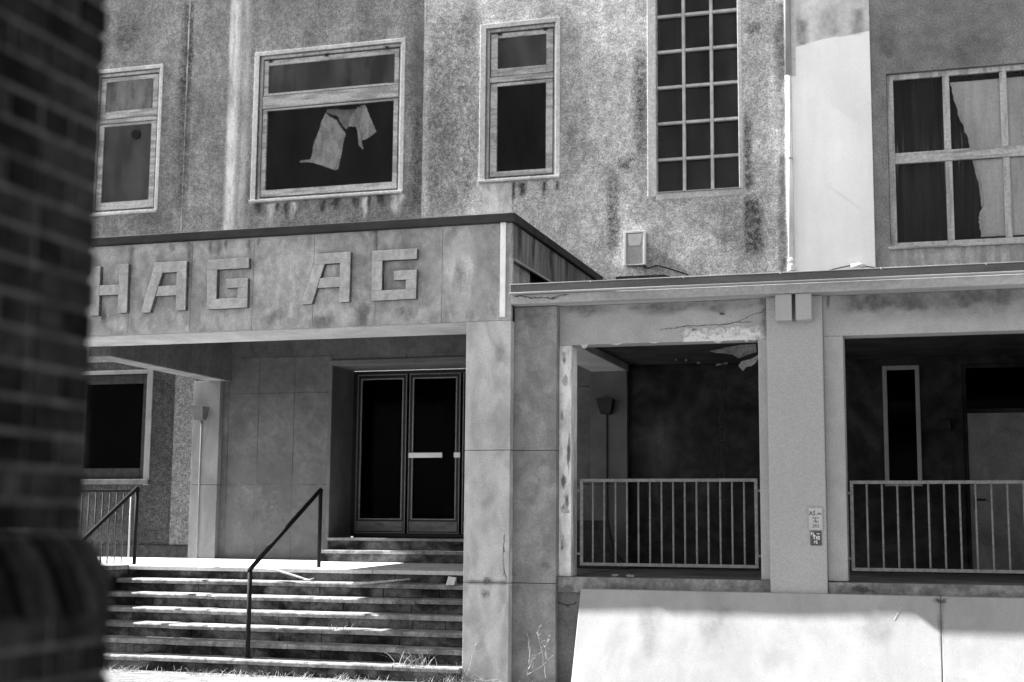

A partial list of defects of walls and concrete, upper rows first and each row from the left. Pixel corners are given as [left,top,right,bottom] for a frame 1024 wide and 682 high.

leakage [608,51,646,246]
crack [661,307,766,330]
flaking render [681,313,765,371]